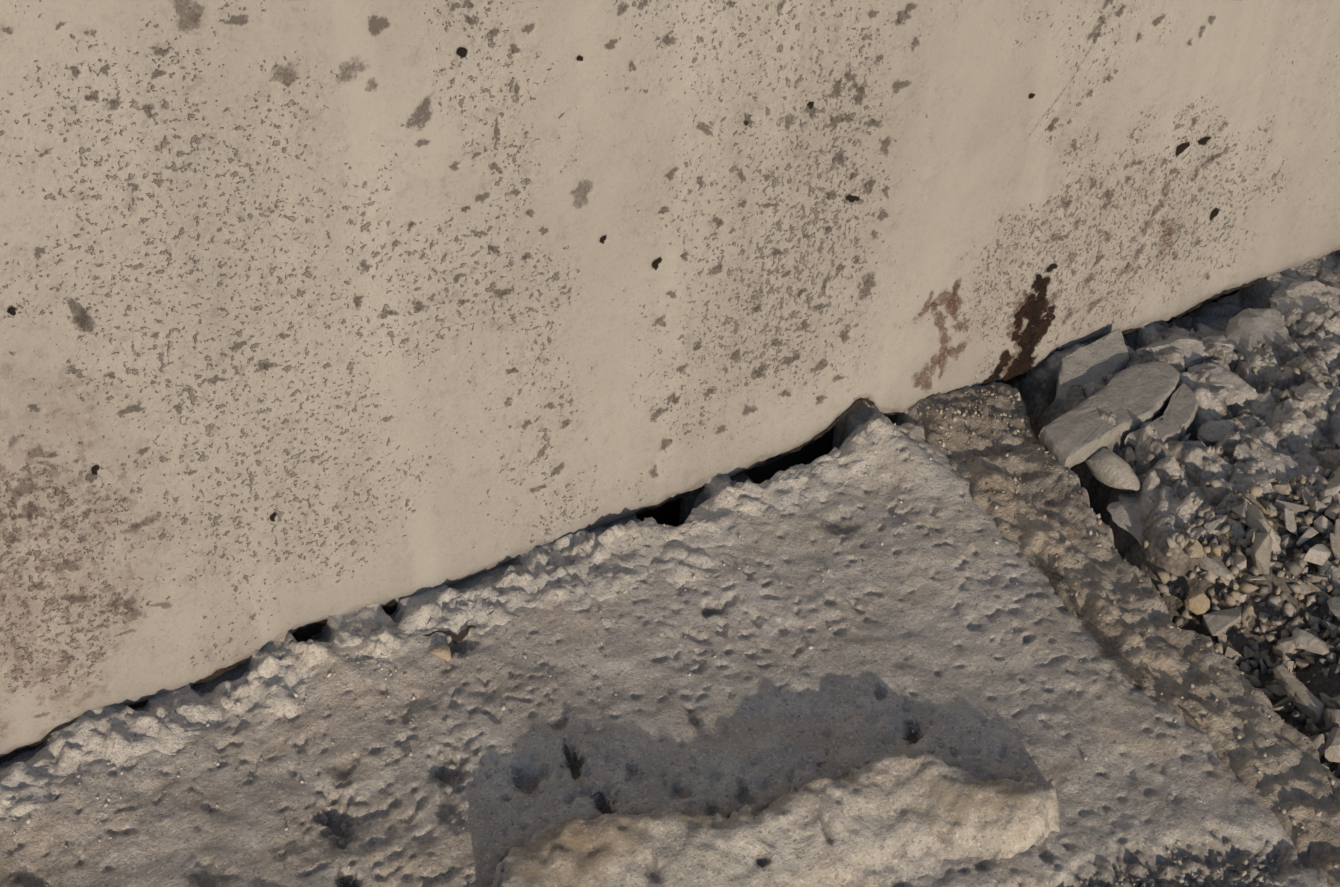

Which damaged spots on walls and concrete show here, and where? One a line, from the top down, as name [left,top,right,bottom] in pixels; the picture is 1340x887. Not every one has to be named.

spalling [834,153,888,239]
spalling [815,256,860,310]
spalling [860,274,875,298]
spalling [771,339,800,365]
corrosion [915,280,969,390]
corrosion [981,274,1065,386]
spalling [651,393,678,420]